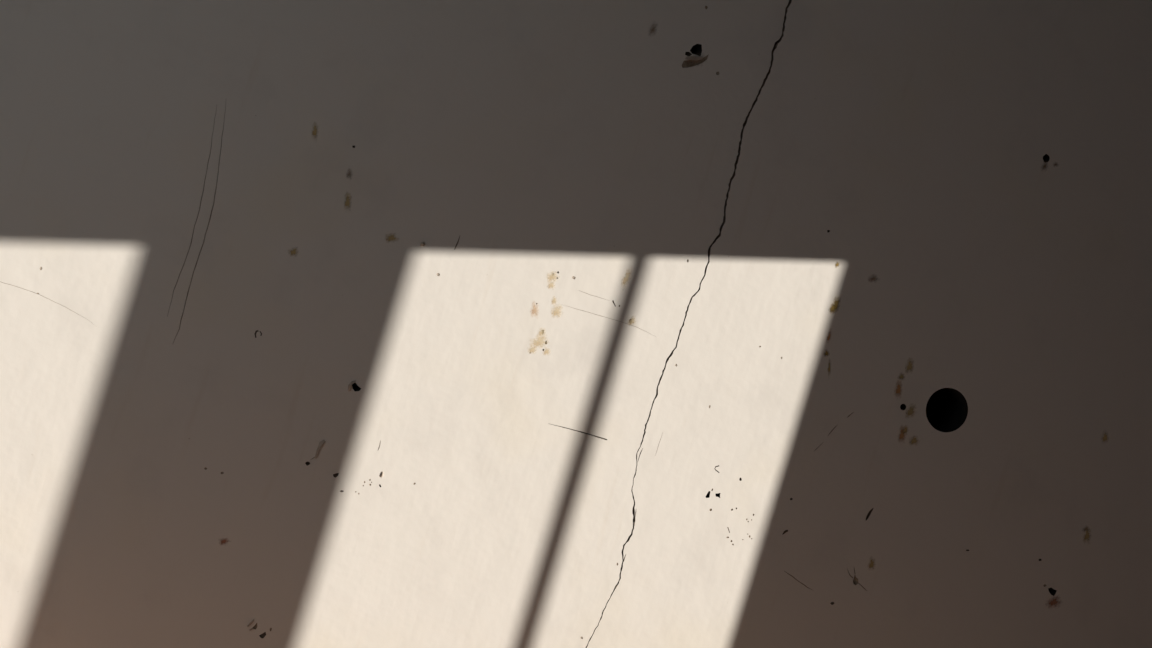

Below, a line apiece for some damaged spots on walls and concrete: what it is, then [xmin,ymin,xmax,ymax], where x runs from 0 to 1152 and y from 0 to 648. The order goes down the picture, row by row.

crack [586,0,792,648]